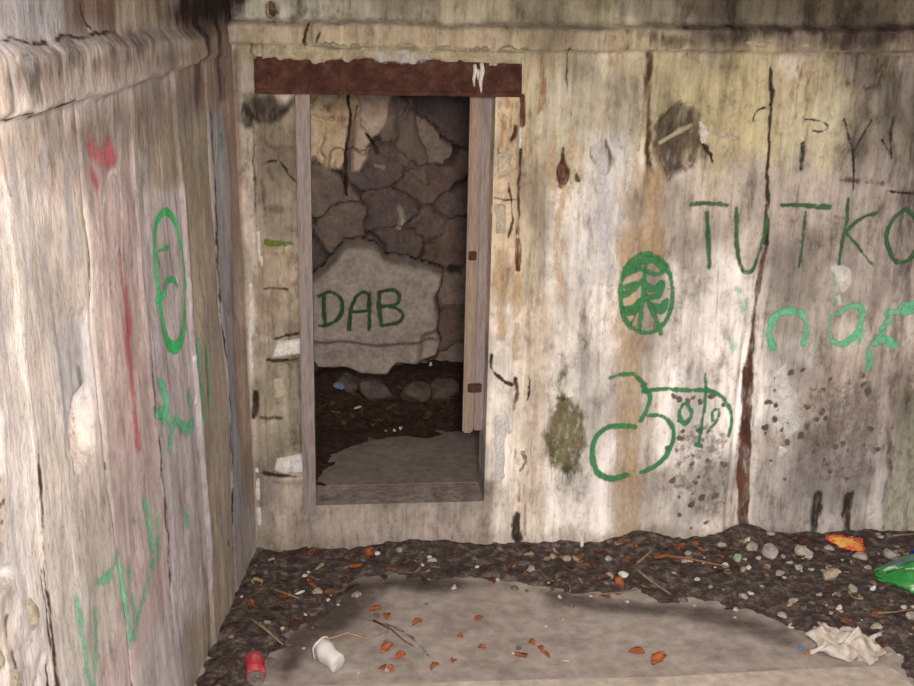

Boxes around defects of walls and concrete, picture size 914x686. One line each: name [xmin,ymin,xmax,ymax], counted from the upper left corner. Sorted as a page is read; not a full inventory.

crack [4,3,109,46]
crack [4,101,73,121]
rust [545,131,580,299]
crack [736,67,775,524]
spalling [27,597,40,631]
spalling [0,650,22,686]